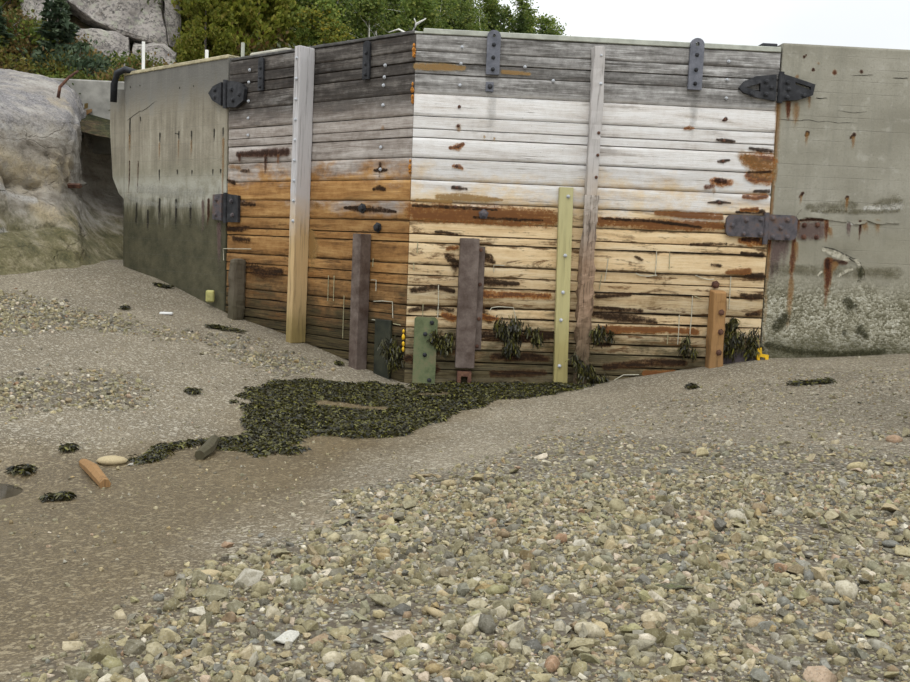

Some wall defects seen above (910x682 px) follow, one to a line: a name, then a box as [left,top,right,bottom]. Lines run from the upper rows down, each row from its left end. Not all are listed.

corrosion [704,177,734,192]
corrosion [735,101,798,214]
corrosion [738,218,832,311]
corrosion [824,257,848,299]